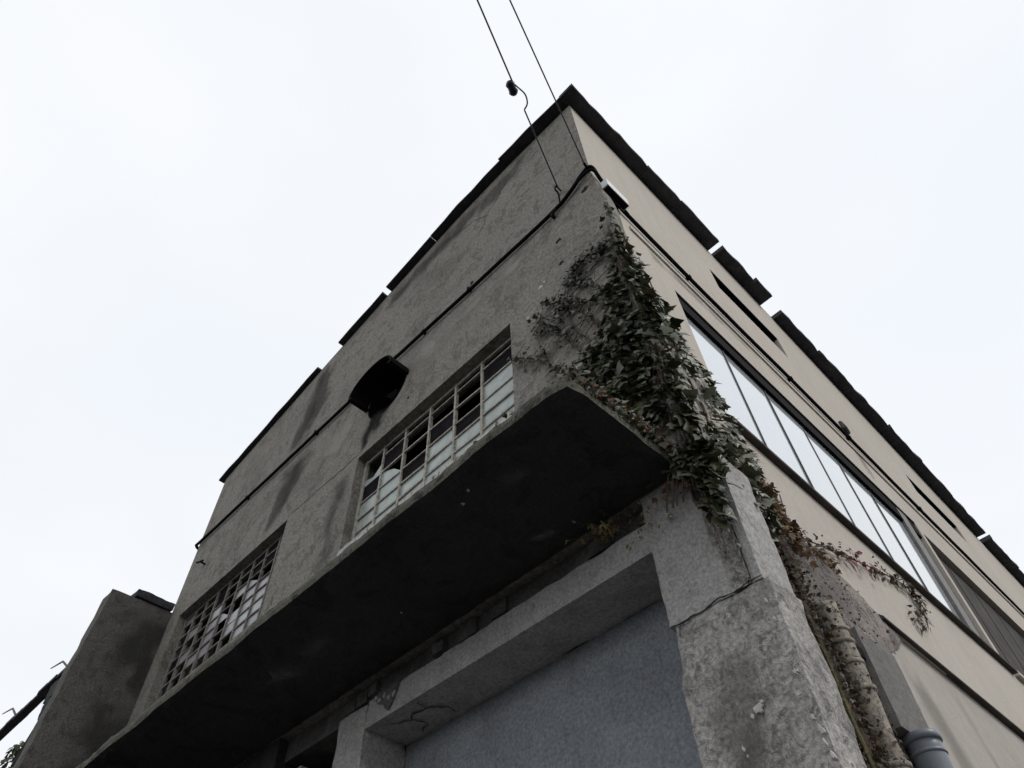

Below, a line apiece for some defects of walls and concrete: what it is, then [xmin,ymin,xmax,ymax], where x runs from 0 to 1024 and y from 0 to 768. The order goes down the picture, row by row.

damp [295,372,328,445]
damp [268,462,303,526]
crack [669,574,763,636]
spalling [373,681,399,710]
crack [390,702,455,731]